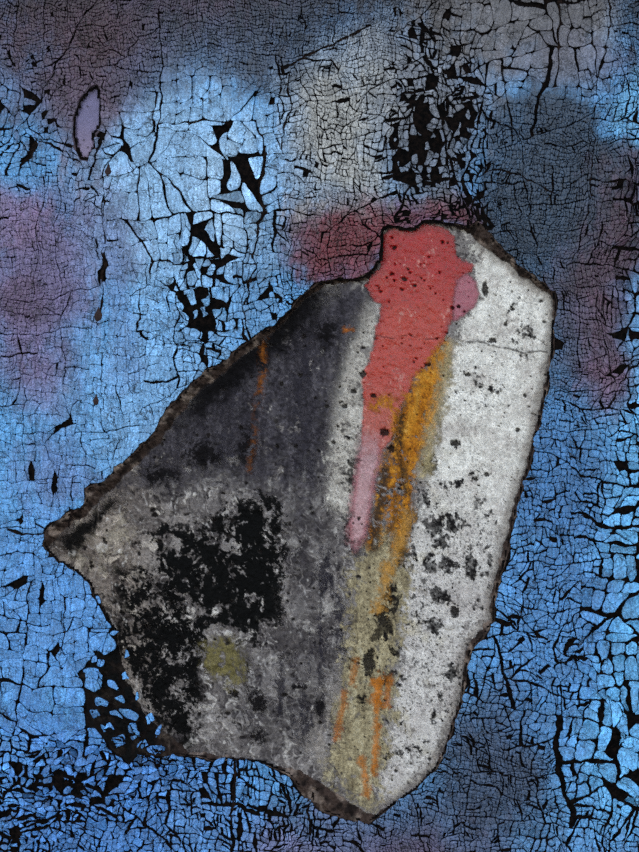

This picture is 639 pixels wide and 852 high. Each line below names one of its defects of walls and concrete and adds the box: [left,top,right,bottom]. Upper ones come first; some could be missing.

crack [21,139,52,164]
peeling [0,72,104,177]
crack [132,160,182,205]
crack [152,95,205,127]
crack [242,25,369,339]
crack [100,201,110,311]
crack [137,237,154,326]
peeling [378,0,608,783]
spalling [34,96,472,824]
crack [0,523,44,536]
rust [358,677,392,796]
crack [228,758,238,825]